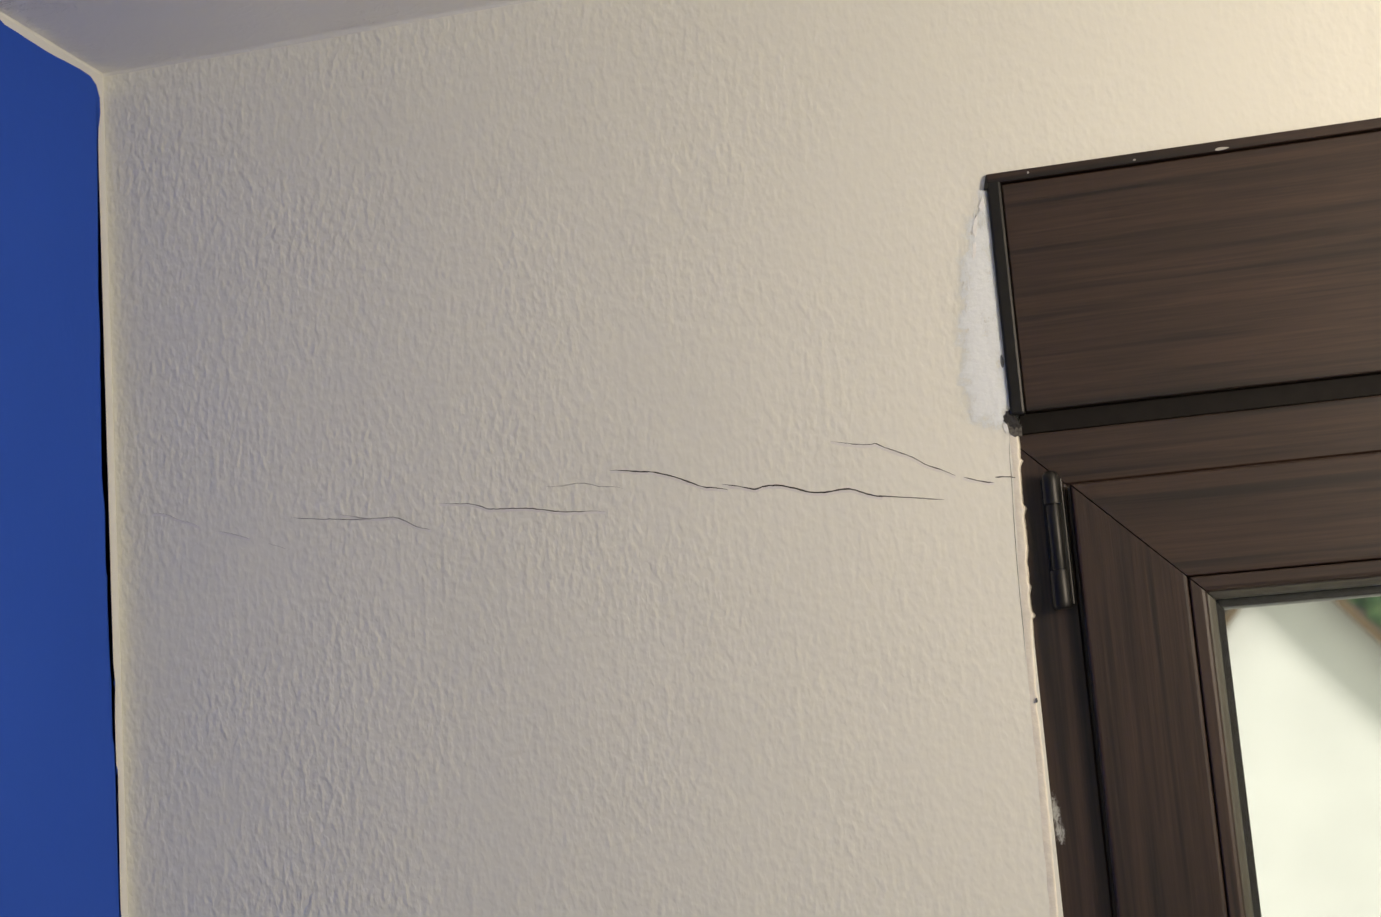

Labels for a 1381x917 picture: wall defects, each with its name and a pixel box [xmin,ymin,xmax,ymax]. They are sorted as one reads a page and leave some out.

crack [299,441,1027,668]